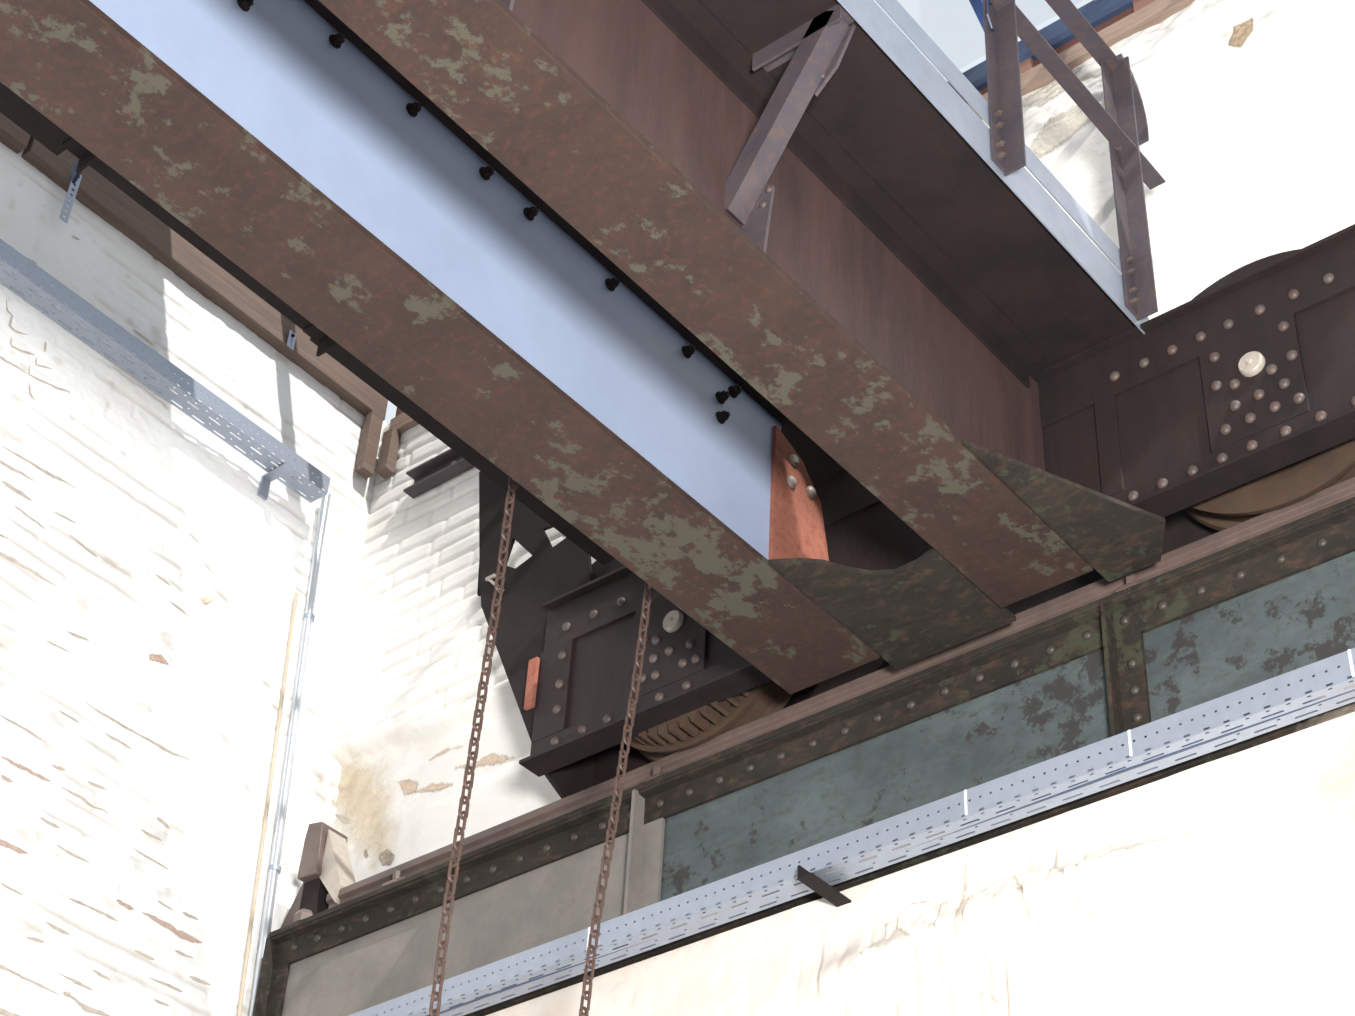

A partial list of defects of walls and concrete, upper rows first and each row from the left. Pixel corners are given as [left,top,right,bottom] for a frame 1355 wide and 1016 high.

spalling [1228,18,1253,47]
spalling [150,654,168,664]
spalling [457,754,510,768]
spalling [400,779,452,795]
spalling [848,849,1134,969]